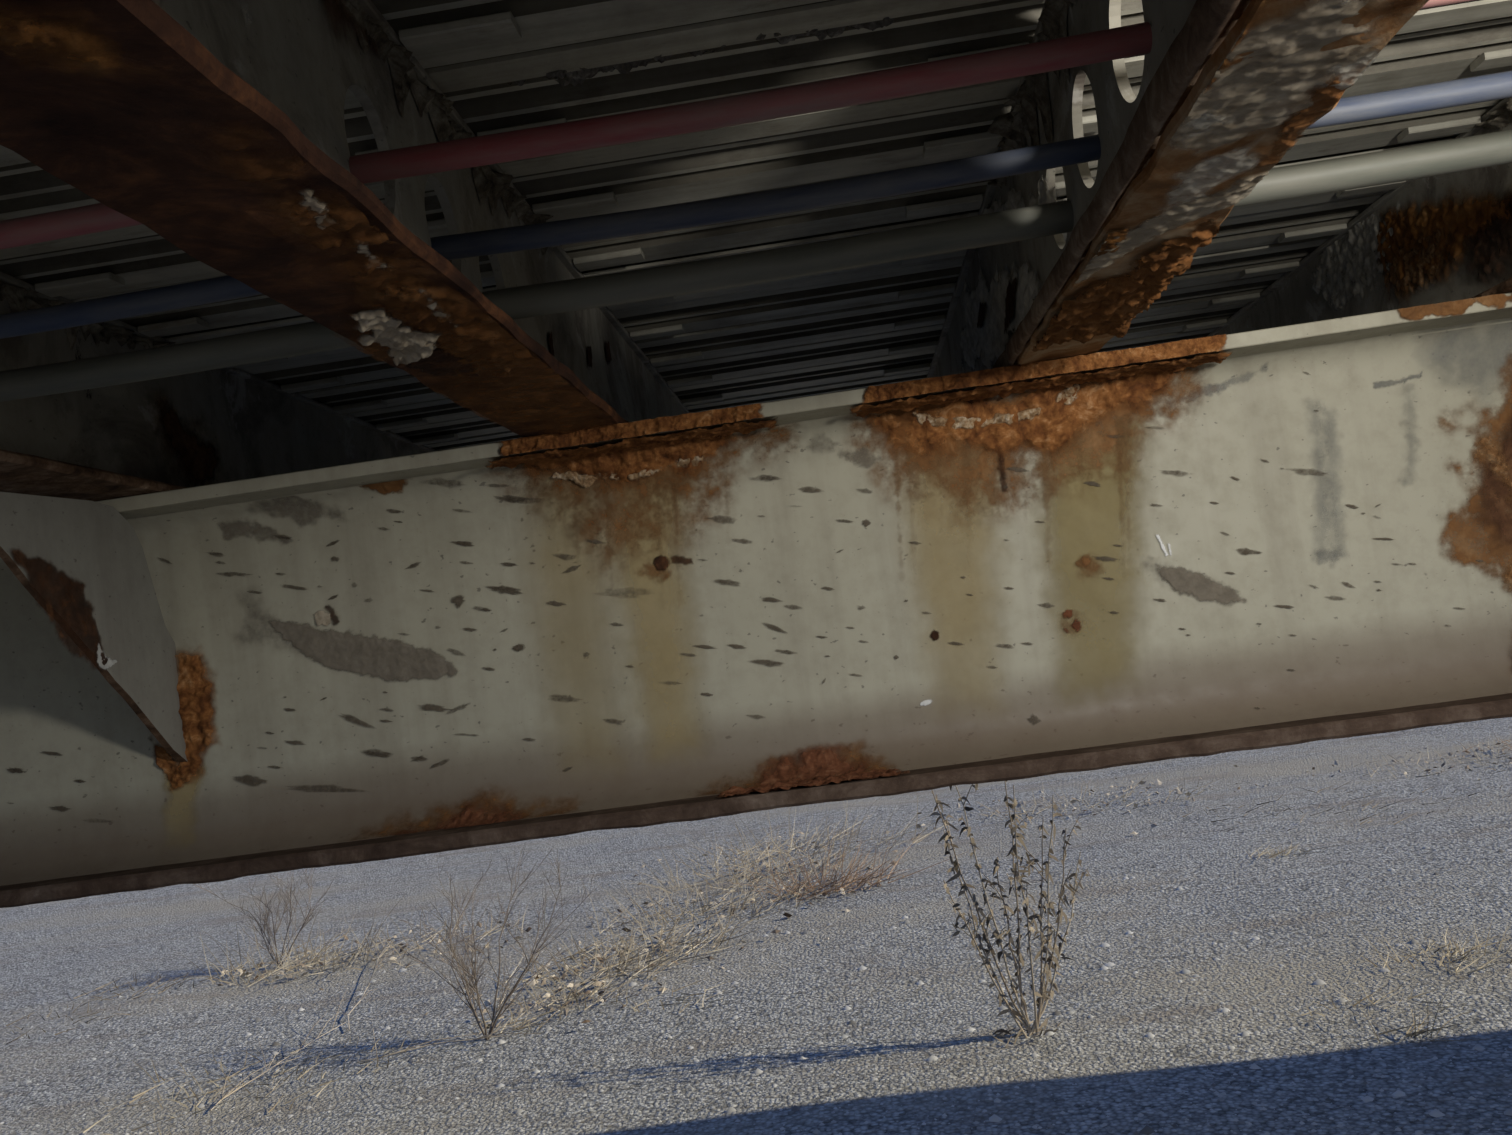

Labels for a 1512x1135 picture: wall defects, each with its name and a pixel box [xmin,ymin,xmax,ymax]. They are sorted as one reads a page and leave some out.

rust [1254,77,1354,167]
peeling [300,192,329,230]
rust [277,200,540,373]
peeling [352,290,480,377]
rust [1398,294,1512,320]
rust [360,479,407,495]
rust [850,219,1232,681]
rust [1441,360,1512,590]
peeling [315,605,340,626]
rust [486,403,790,741]
rust [150,652,216,821]
rust [703,745,909,797]